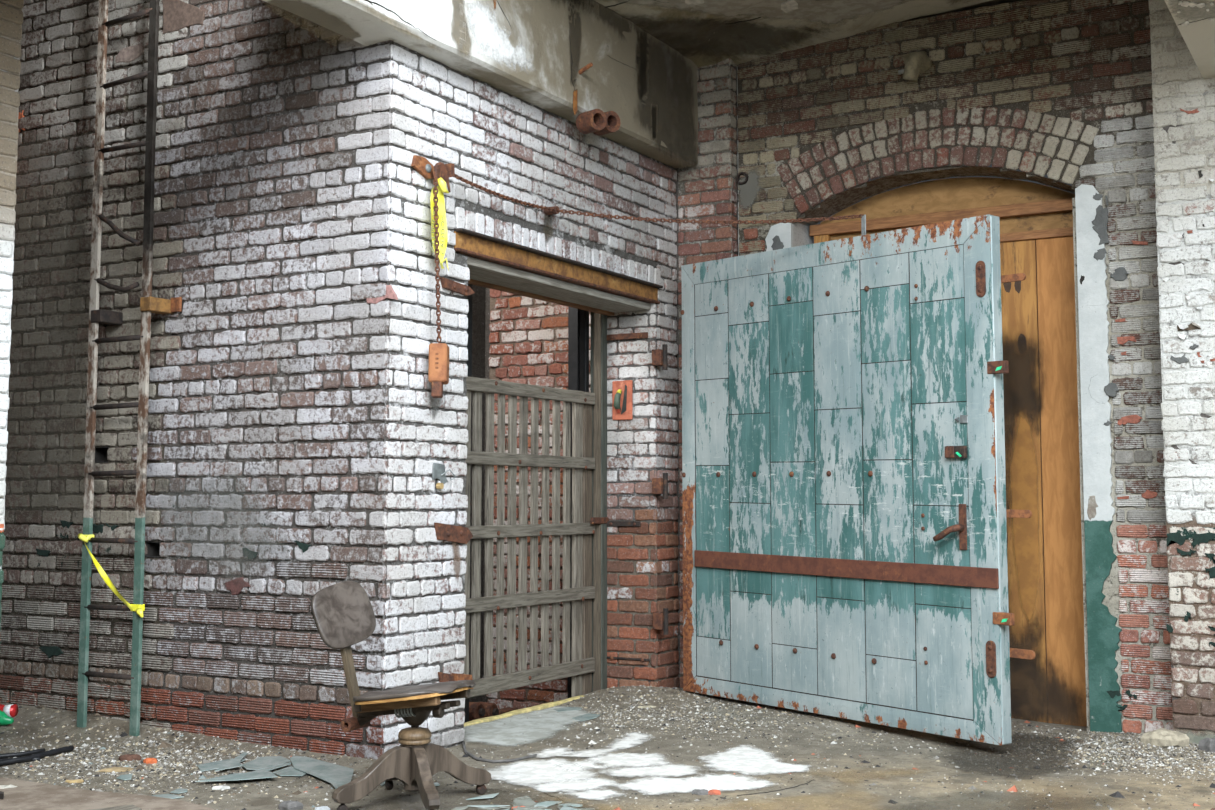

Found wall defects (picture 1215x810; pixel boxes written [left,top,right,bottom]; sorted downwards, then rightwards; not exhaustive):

peeling [1166,531,1215,580]